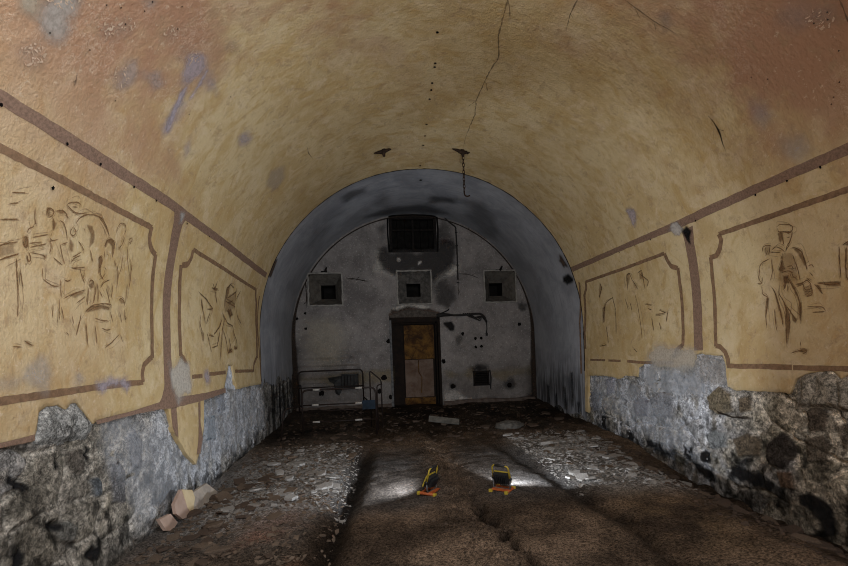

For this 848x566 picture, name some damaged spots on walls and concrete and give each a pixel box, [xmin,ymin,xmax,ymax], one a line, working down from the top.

crack [469,3,510,127]
leakage [376,241,457,306]